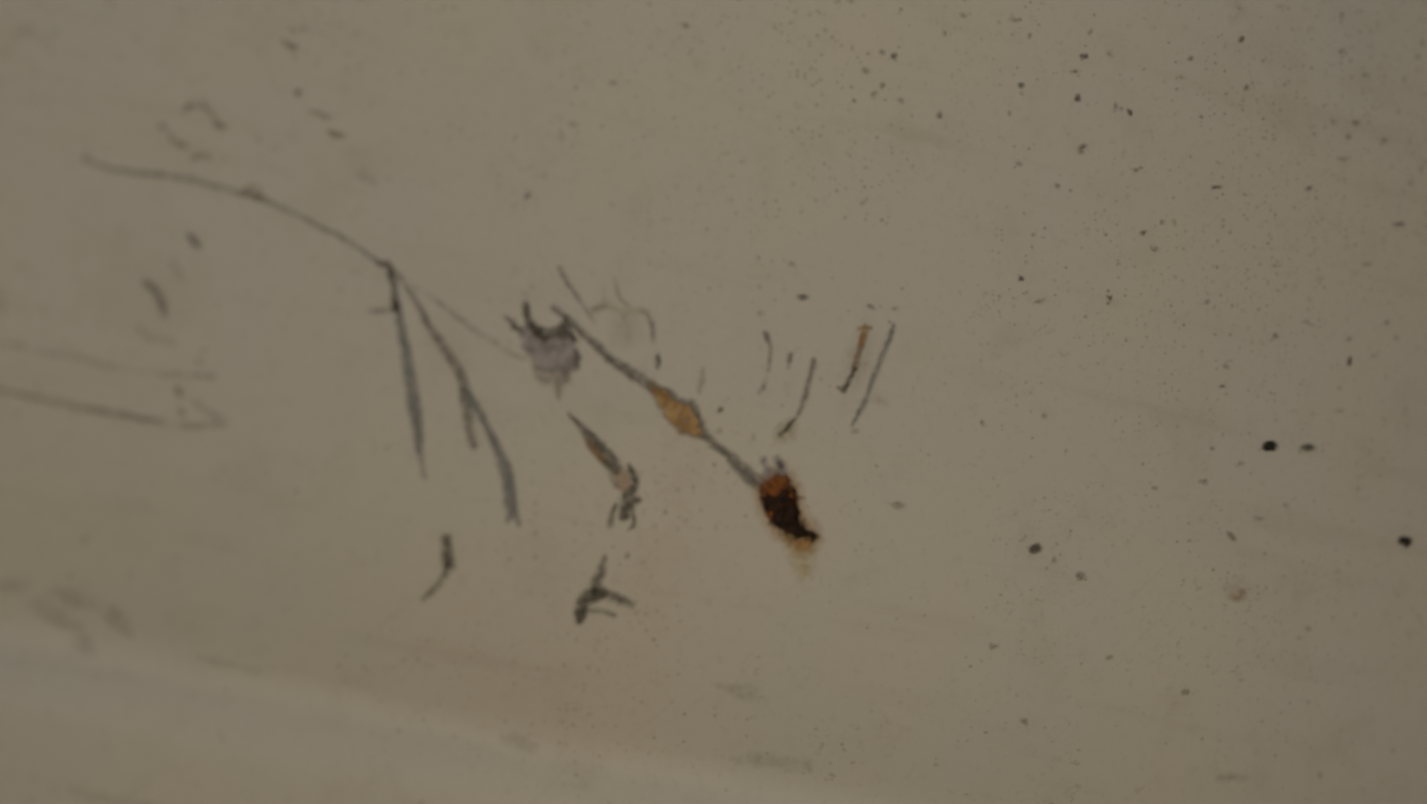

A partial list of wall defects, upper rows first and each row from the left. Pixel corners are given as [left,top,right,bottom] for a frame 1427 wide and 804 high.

peeling [506,303,580,373]
rust [759,456,817,549]